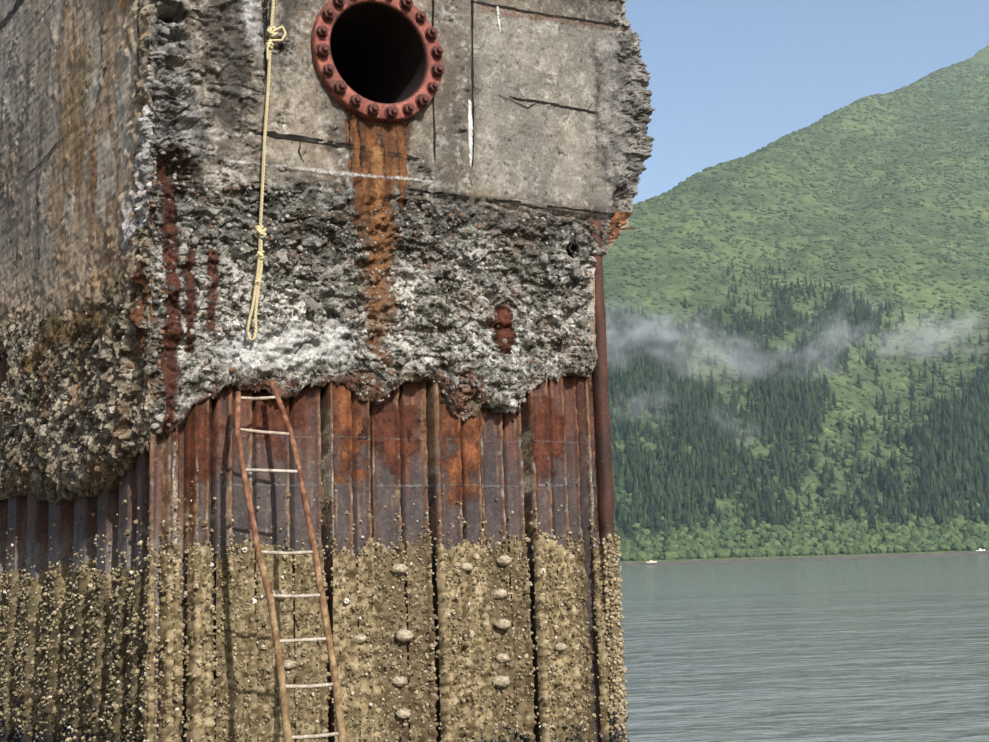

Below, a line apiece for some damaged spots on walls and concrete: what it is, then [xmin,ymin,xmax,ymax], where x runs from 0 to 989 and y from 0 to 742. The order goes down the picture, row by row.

crack [0,0,22,29]
corrosion [58,39,112,289]
crack [254,97,436,162]
crack [407,0,630,217]
corrosion [129,260,150,364]
corrosion [157,162,225,506]
spalling [0,0,642,506]
corrosion [345,108,414,365]
corrosion [489,304,516,357]
corrosion [249,387,313,460]
corrosion [321,383,481,509]
corrosion [515,396,566,477]